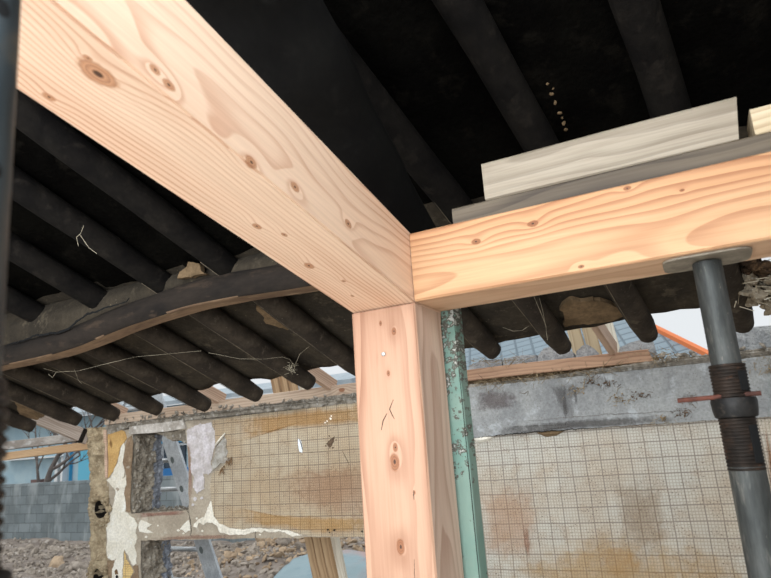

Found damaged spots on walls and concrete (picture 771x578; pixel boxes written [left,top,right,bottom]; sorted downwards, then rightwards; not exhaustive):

spalling [86,427,159,578]
peeling [186,422,232,506]